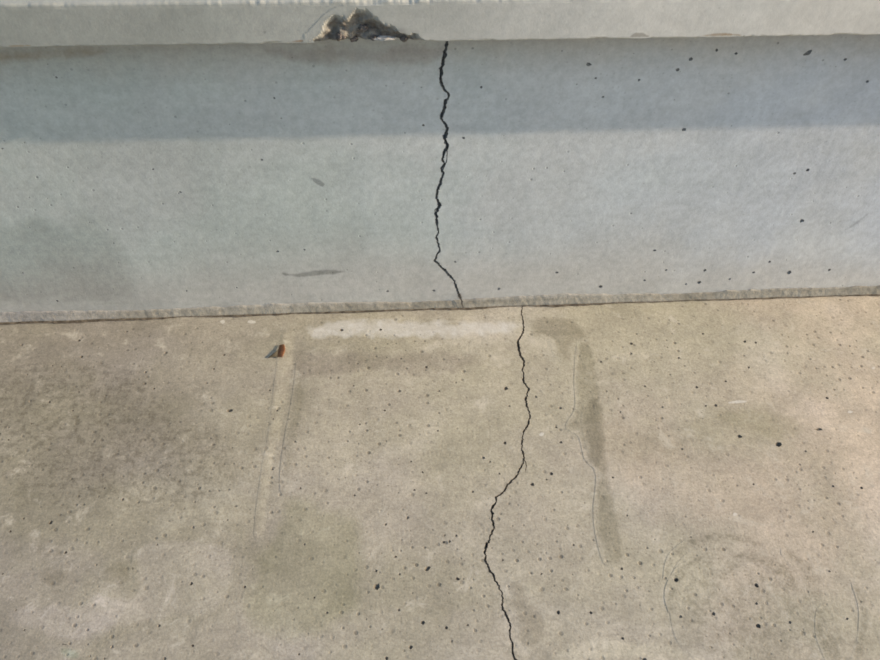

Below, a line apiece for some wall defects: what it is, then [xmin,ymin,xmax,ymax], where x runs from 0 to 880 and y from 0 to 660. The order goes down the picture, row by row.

spalling [303,4,426,42]
crack [433,41,463,308]
crack [483,307,531,660]